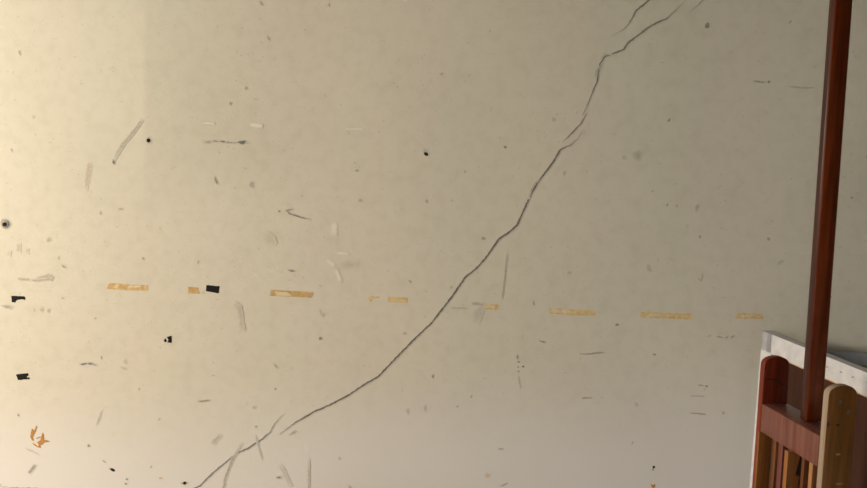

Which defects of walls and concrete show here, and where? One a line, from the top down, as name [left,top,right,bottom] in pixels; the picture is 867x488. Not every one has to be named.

crack [194,0,705,488]